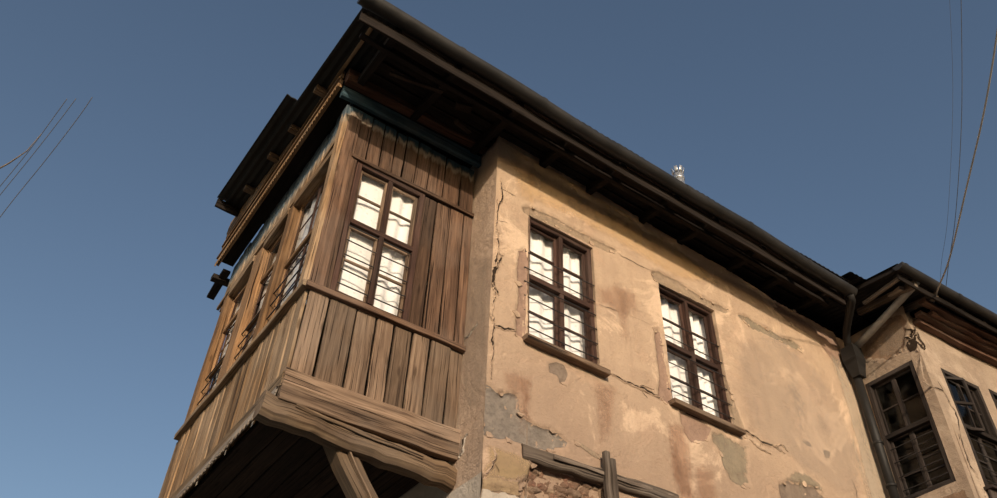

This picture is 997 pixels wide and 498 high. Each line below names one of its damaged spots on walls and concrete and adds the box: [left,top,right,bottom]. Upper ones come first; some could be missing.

crack [464,177,516,380]
spalling [549,362,567,386]
crack [611,373,664,401]
spalling [652,327,671,404]
spalling [483,385,602,461]
spalling [680,388,751,489]
crack [746,430,789,454]
spalling [516,460,605,498]
spalling [779,481,823,498]